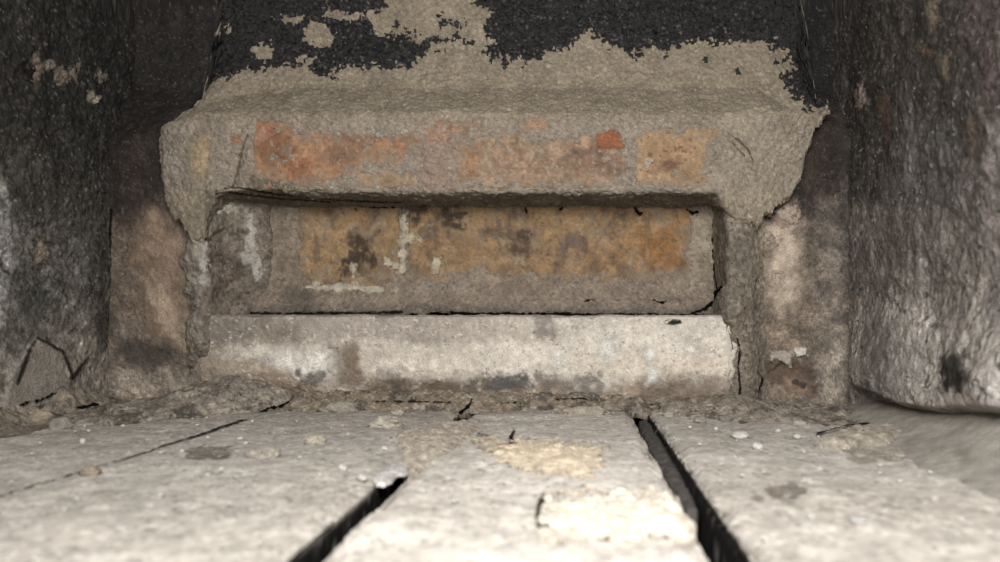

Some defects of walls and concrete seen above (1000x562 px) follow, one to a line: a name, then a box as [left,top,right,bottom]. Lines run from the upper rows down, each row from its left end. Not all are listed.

leakage [384,211,422,274]
leakage [432,257,441,274]
crack [16,337,99,409]
crack [737,338,764,395]
crack [0,397,293,496]